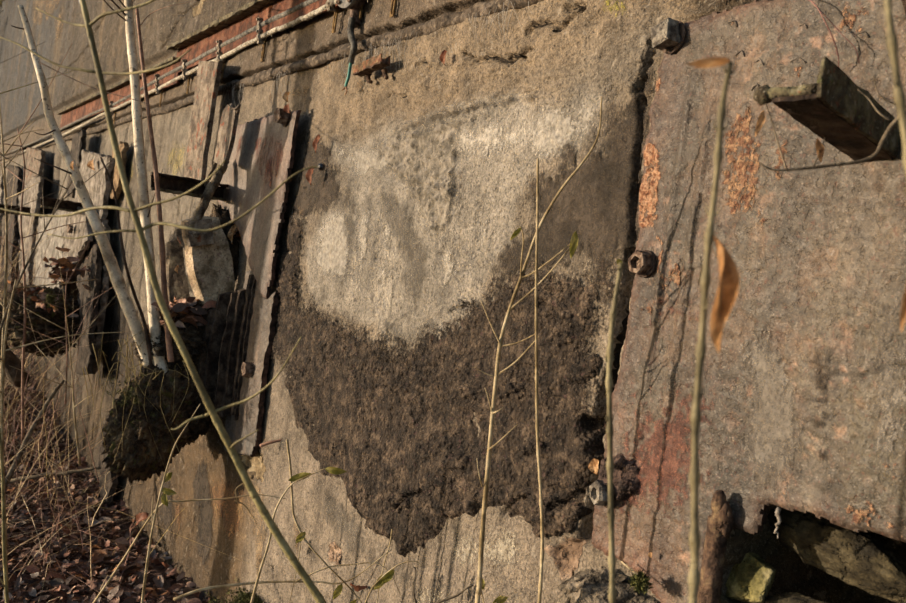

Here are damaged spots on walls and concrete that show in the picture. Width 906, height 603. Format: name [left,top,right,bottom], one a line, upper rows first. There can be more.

corrosion [237,136,283,188]
damp [292,131,425,298]
efflorescence [443,251,456,287]
damp [451,69,658,284]
corrosion [598,385,712,519]
efflorescence [453,527,520,570]